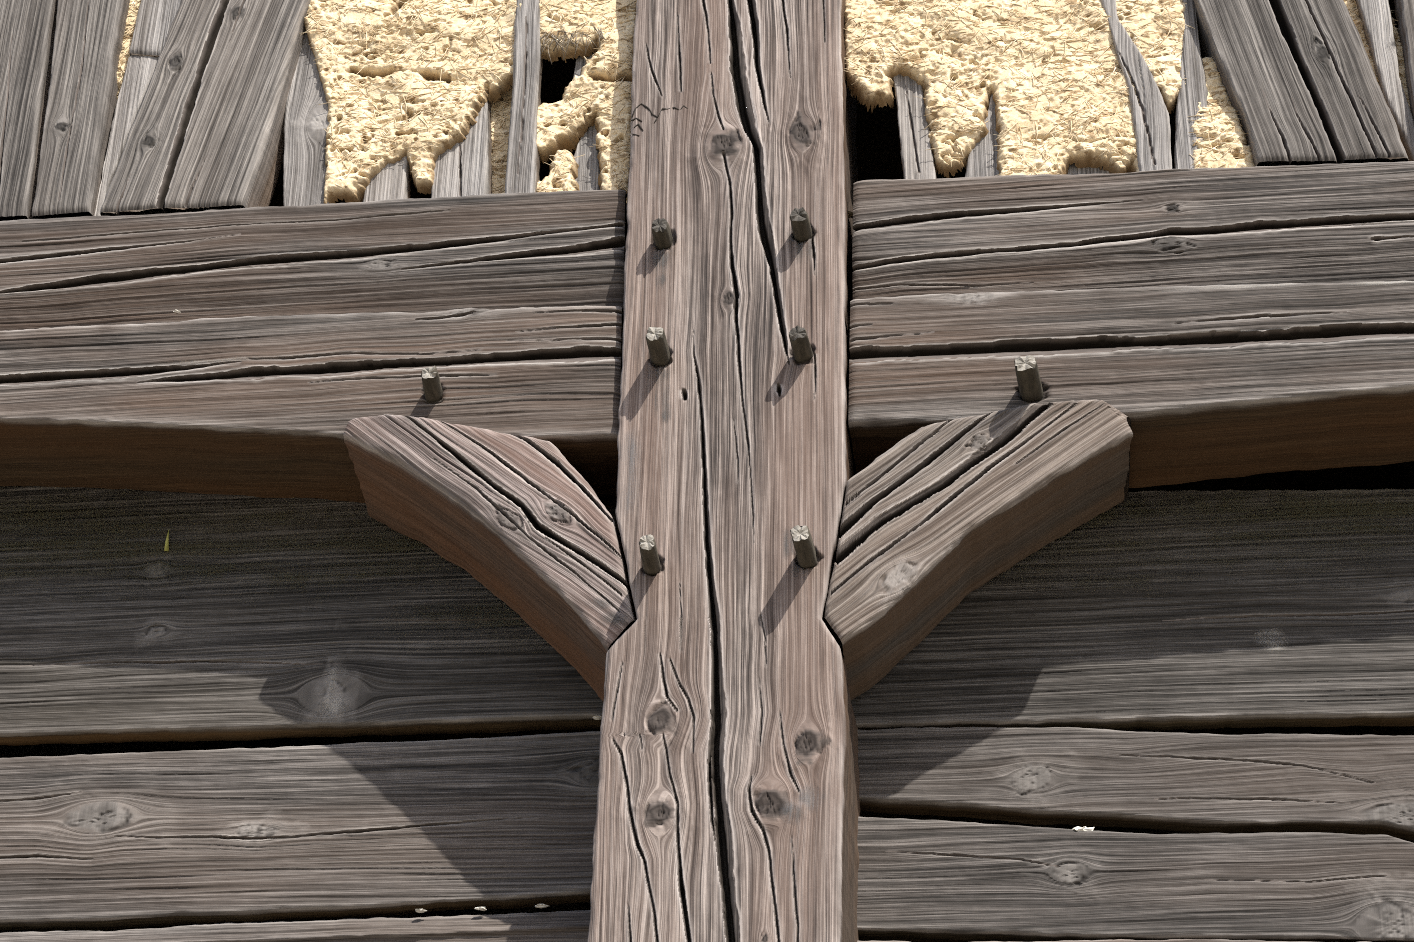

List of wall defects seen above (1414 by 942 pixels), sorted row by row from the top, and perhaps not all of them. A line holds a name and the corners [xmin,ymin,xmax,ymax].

crack [0,0,626,294]
spalling [324,71,513,204]
spalling [537,104,606,191]
spalling [1055,148,1139,175]
spalling [1149,67,1181,114]
crack [404,416,629,613]
crack [583,0,1414,942]
crack [25,659,342,667]